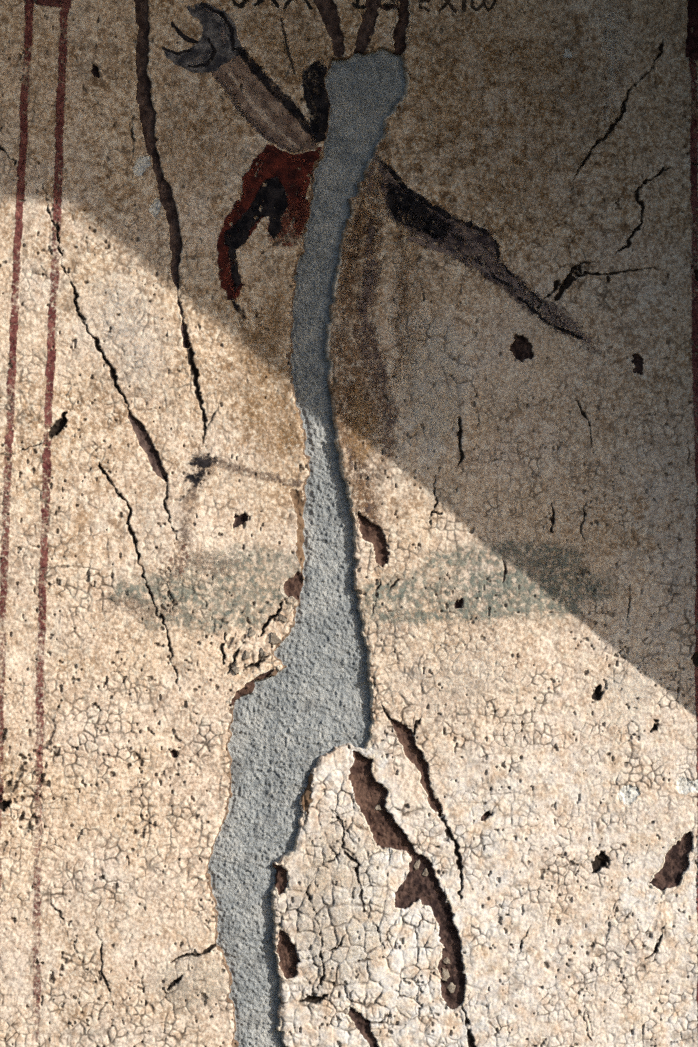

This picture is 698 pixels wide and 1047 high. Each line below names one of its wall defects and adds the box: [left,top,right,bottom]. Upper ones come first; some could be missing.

crack [131,0,216,442]
crack [571,41,663,191]
crack [537,163,698,310]
crack [43,190,177,540]
crack [95,450,180,690]
spalling [219,489,305,708]
crack [167,0,463,1047]
spalling [357,512,389,570]
spalling [272,863,290,897]
spalling [274,927,300,980]
spalling [346,750,476,1047]
spalling [648,830,692,894]